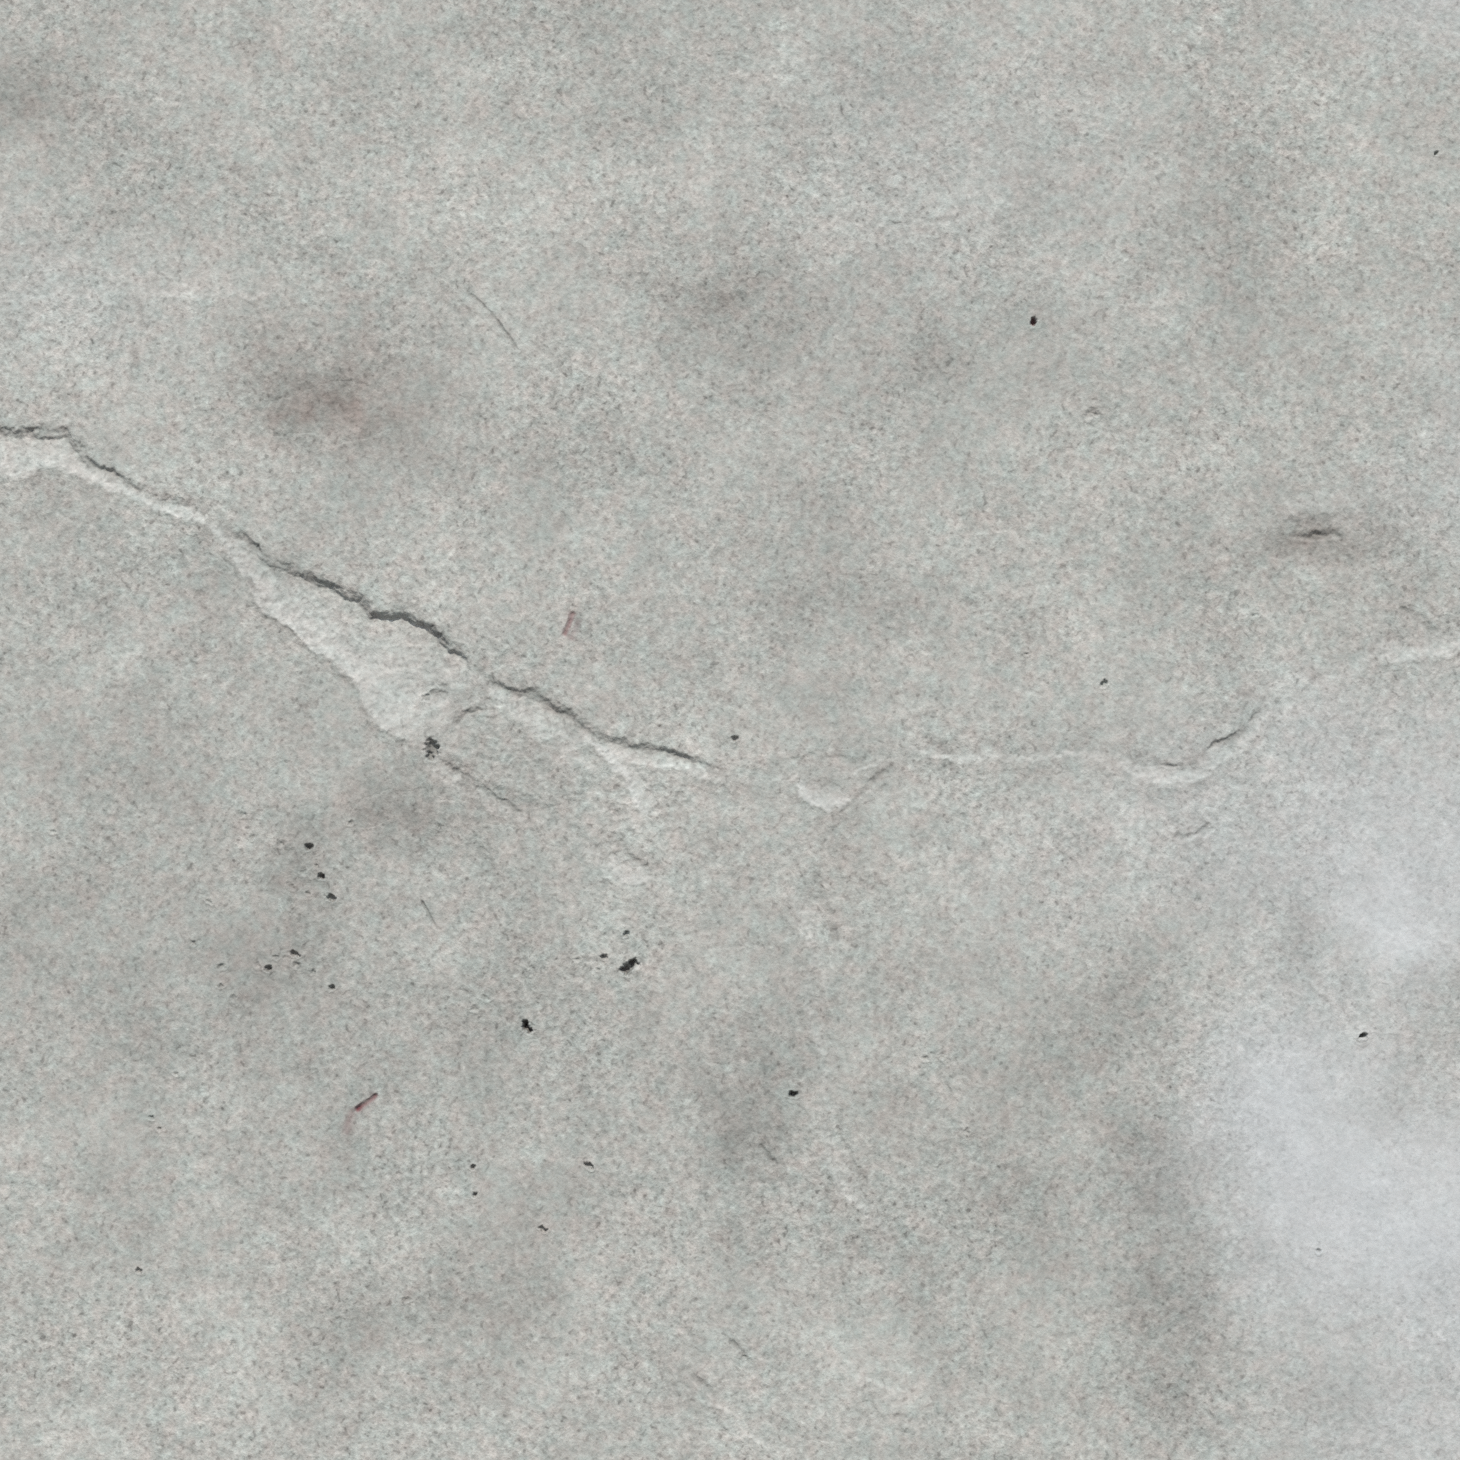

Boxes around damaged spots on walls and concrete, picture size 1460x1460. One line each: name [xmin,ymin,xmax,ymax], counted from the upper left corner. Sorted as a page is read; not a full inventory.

crack [0,414,207,539]
crack [482,574,1460,856]